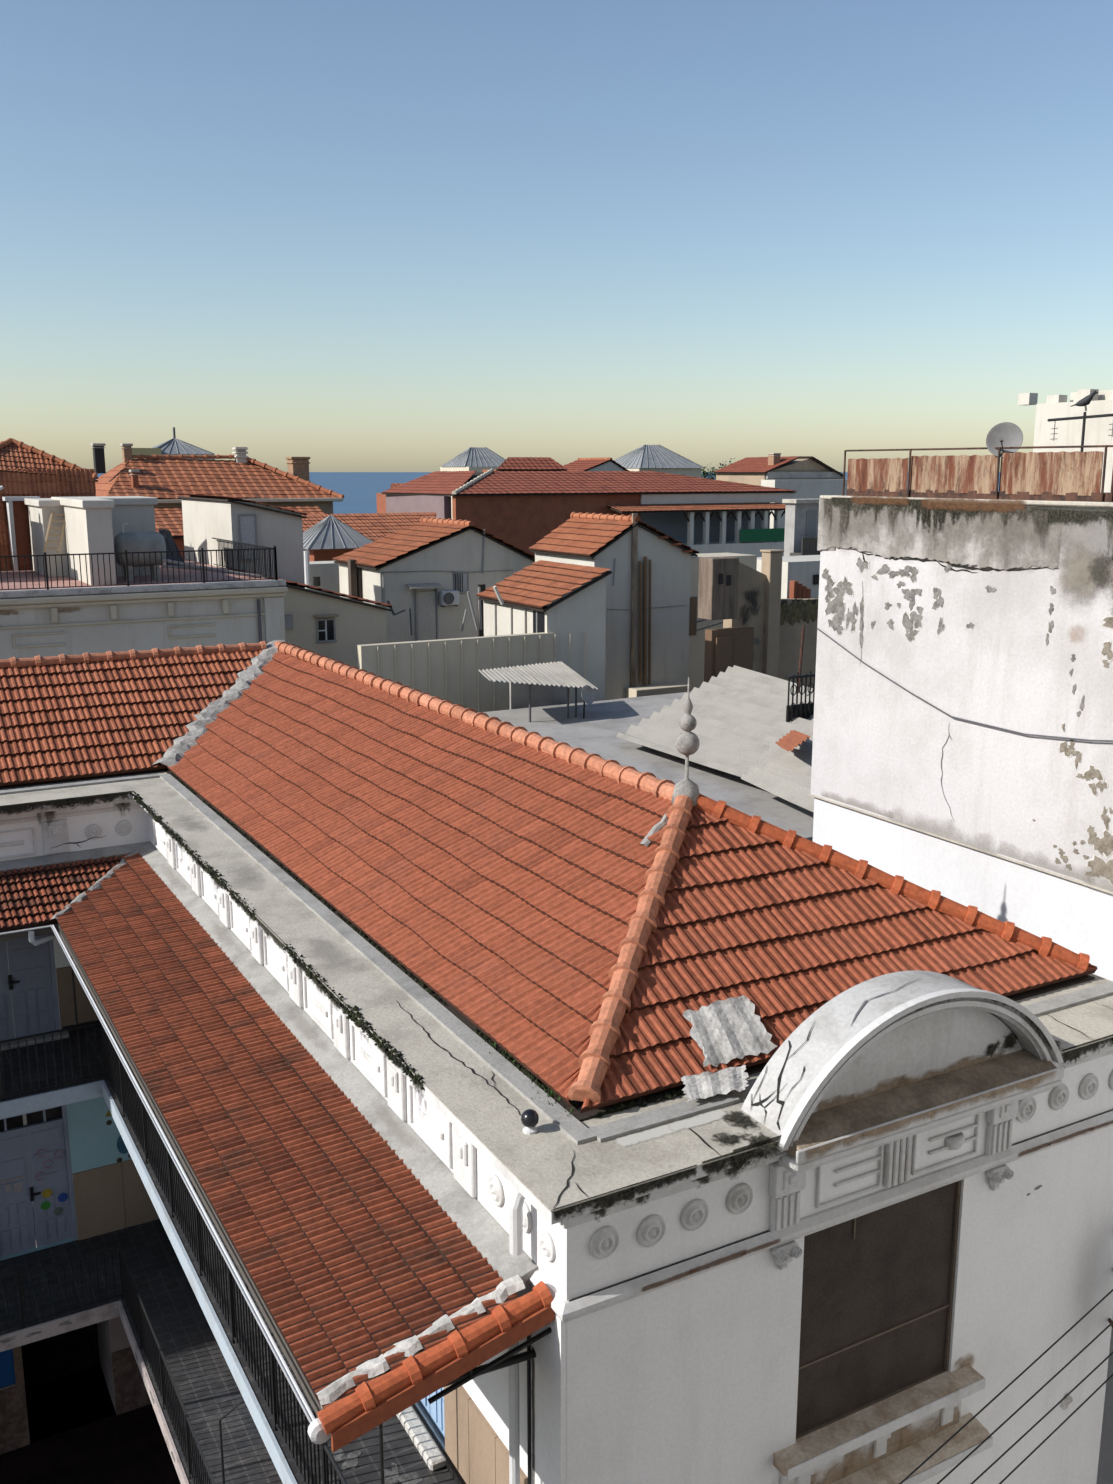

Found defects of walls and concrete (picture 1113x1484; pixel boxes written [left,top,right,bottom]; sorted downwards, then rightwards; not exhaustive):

leakage [824,497,1113,598]
peeling [821,556,952,649]
peeling [1045,586,1056,645]
peeling [1100,616,1113,668]
peeling [1053,654,1113,886]
crack [850,978,920,1026]
crack [750,1021,815,1130]
leakage [552,1110,782,1222]
leakage [810,1409,960,1484]